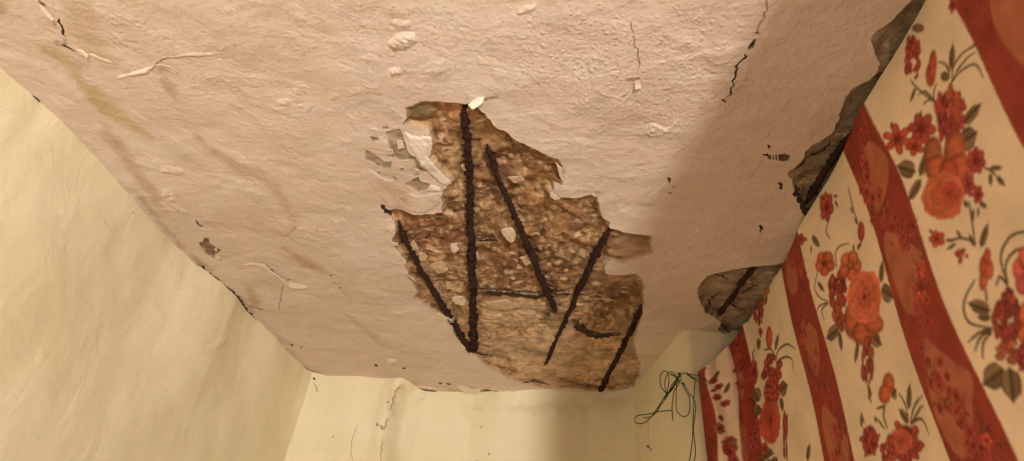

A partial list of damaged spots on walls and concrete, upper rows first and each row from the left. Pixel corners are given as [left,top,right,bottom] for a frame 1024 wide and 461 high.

crack [38,0,224,79]
crack [693,0,768,106]
spalling [767,0,926,216]
spalling [365,94,654,392]
spalling [697,263,783,334]